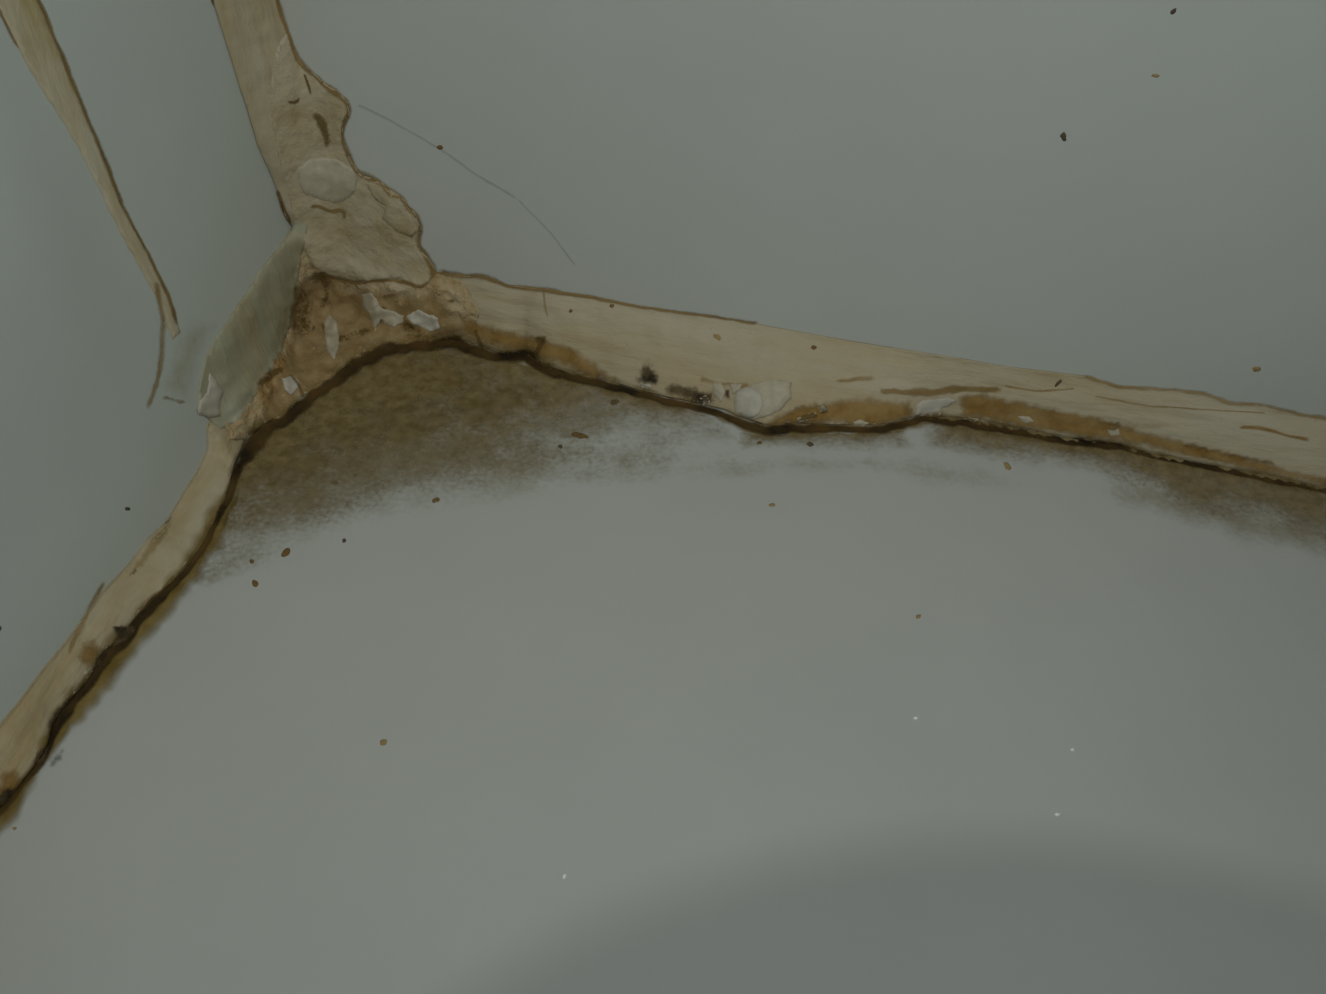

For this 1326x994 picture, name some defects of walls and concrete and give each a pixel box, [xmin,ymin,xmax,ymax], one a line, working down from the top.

peeling [361,293,440,332]
peeling [324,314,340,359]
peeling [282,376,299,395]
peeling [700,379,792,420]
peeling [916,398,957,416]
water stain [221,349,729,530]
water stain [936,416,1326,535]
crack [0,293,1326,817]